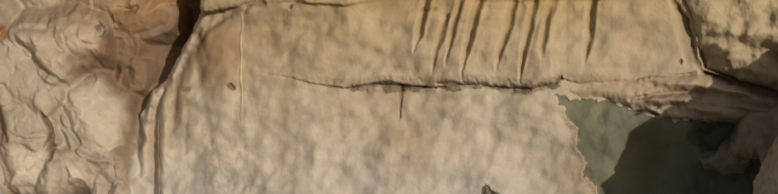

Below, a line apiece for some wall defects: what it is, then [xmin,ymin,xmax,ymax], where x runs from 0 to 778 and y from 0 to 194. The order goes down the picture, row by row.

crack [352,78,560,94]
peeling [556,94,761,194]